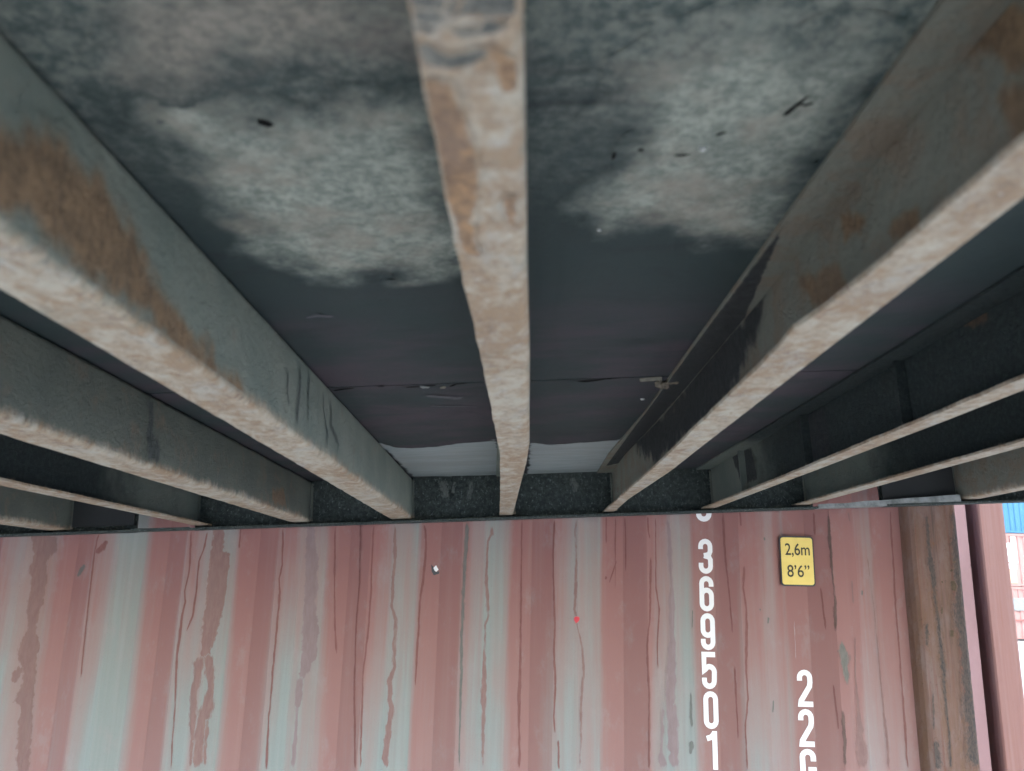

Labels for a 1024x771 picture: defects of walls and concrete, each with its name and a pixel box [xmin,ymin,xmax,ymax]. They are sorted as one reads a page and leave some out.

rust [0,101,246,393]
leakage [69,0,462,290]
rust [425,78,481,258]
rust [486,46,518,94]
rust [502,194,519,229]
leakage [554,0,912,255]
rust [796,205,868,311]
rust [885,201,924,246]
rust [961,0,1024,145]